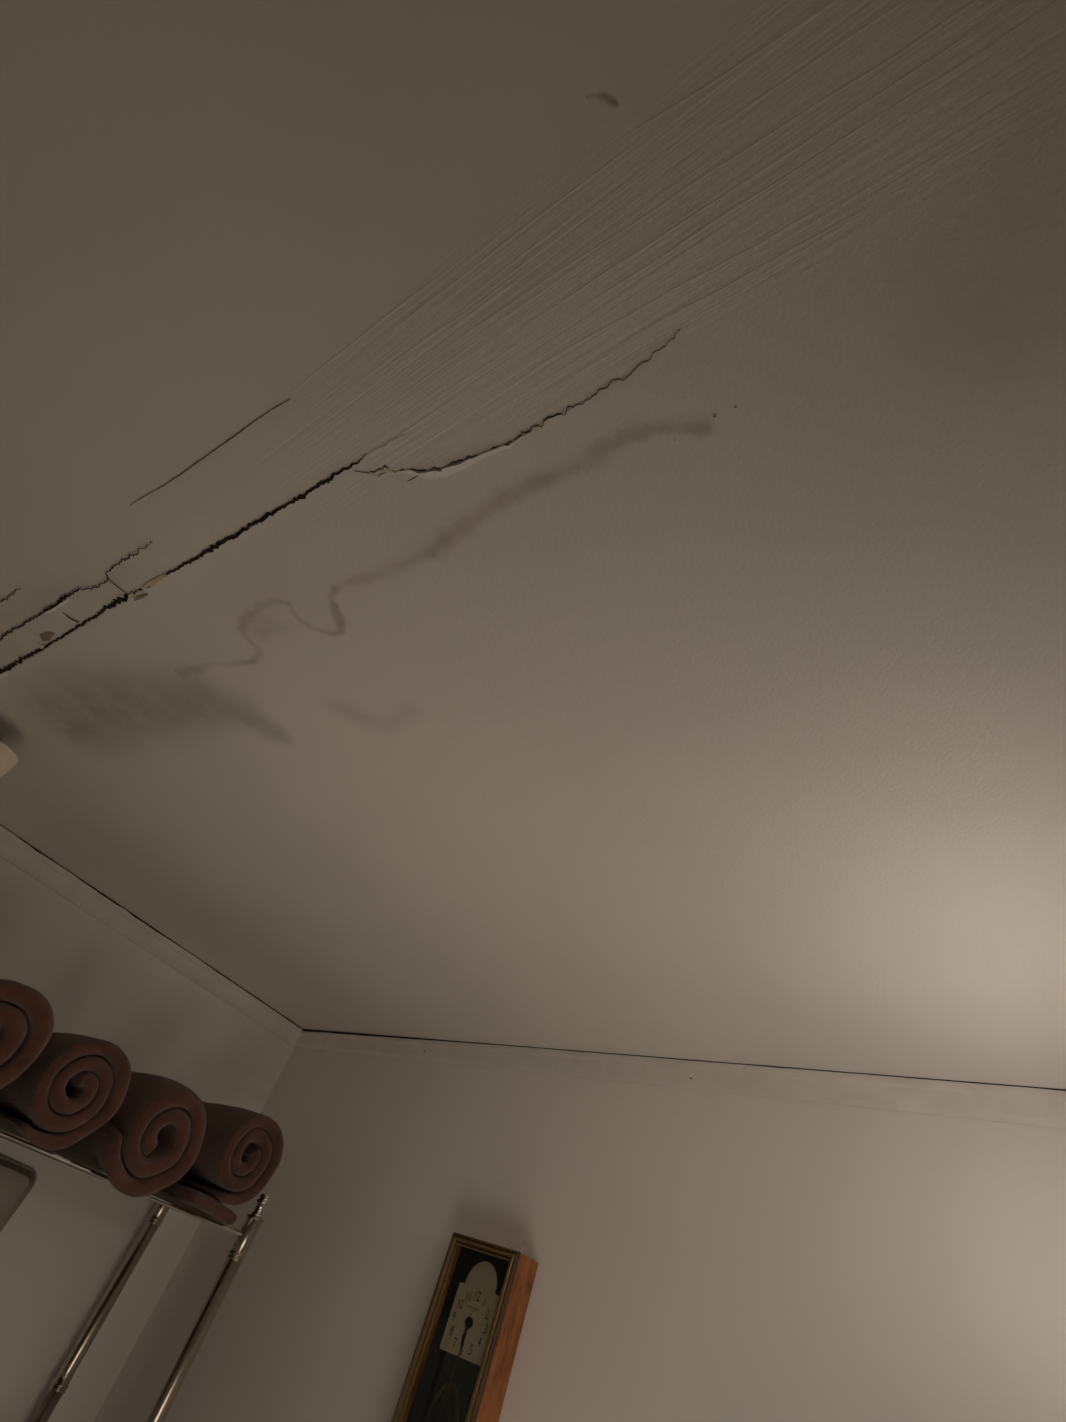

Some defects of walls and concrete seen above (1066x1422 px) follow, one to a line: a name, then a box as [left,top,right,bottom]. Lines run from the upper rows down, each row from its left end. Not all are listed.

crack [0,329,705,684]